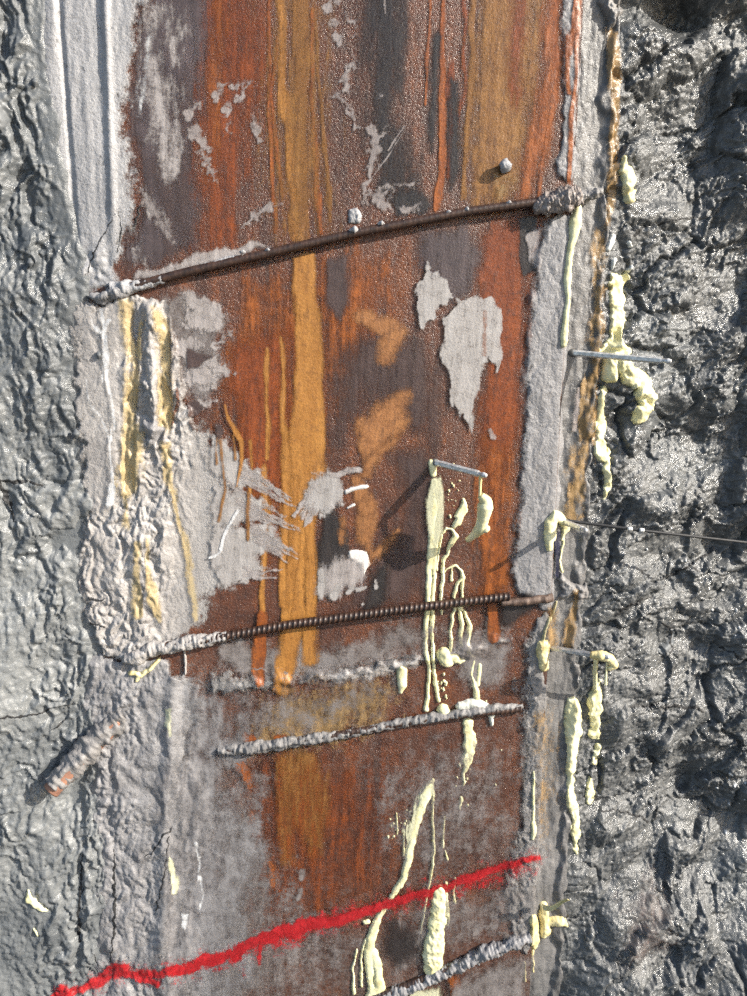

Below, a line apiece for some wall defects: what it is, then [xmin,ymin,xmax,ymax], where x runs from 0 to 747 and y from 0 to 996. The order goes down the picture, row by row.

rust [424,0,582,212]
spalling [109,197,538,295]
rust [199,0,411,914]
rust [472,221,531,644]
crack [76,849,117,967]
crack [141,827,172,911]